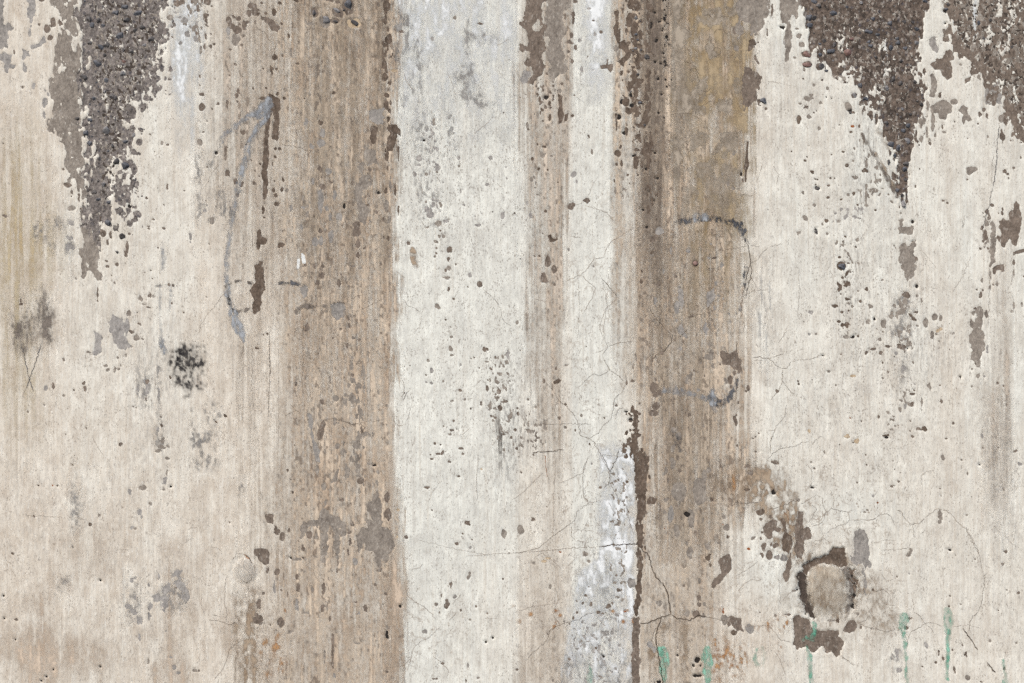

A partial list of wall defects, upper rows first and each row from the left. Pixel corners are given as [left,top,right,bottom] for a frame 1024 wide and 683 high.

spalling [0,0,215,302]
crack [385,540,477,676]
water stain [513,0,572,441]
crack [517,180,798,683]
water stain [539,0,847,683]
peeling [747,498,874,657]
crack [646,245,985,645]
spalling [733,0,1024,439]